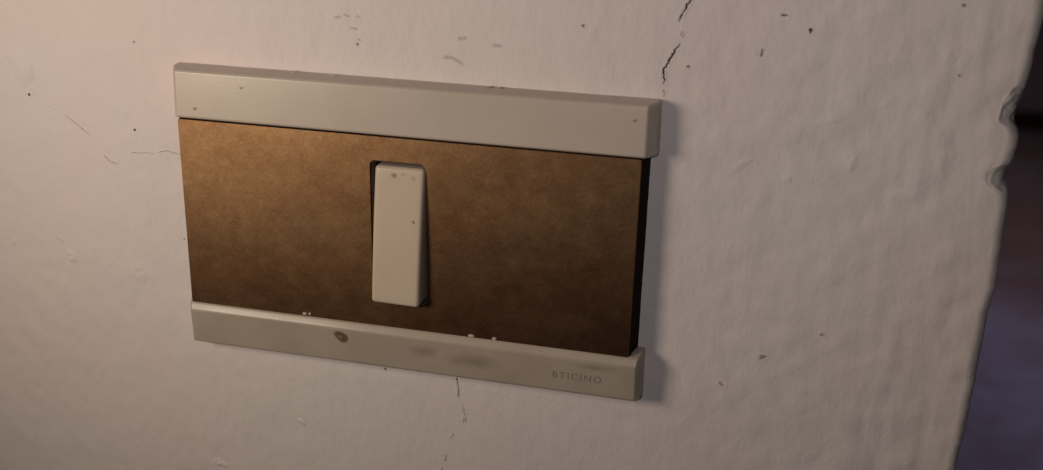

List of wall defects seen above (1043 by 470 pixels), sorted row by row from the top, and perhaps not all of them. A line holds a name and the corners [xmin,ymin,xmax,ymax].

crack [659,0,695,97]